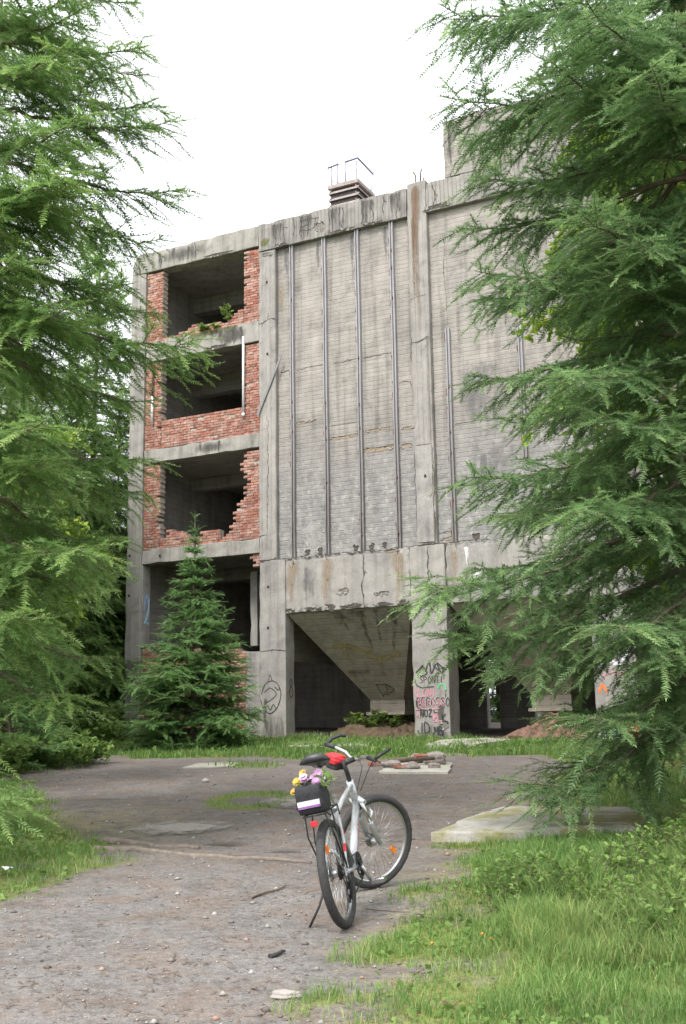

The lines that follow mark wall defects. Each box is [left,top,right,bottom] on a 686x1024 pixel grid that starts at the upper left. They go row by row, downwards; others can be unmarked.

crack [259,417,498,607]